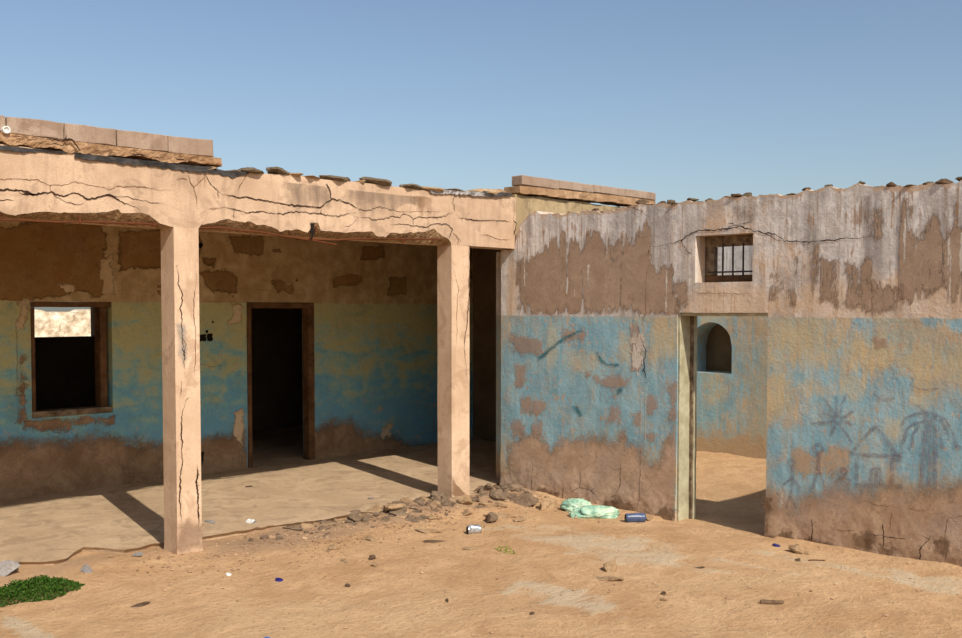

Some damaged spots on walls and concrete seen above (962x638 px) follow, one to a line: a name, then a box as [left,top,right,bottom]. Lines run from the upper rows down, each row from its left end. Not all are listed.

crack [12,135,80,151]
peeling [0,209,170,330]
crack [0,150,509,367]
spalling [198,219,451,297]
crack [638,223,874,383]
peeling [769,197,962,316]
crack [176,267,220,520]
peeling [501,219,688,521]
crack [836,501,959,559]